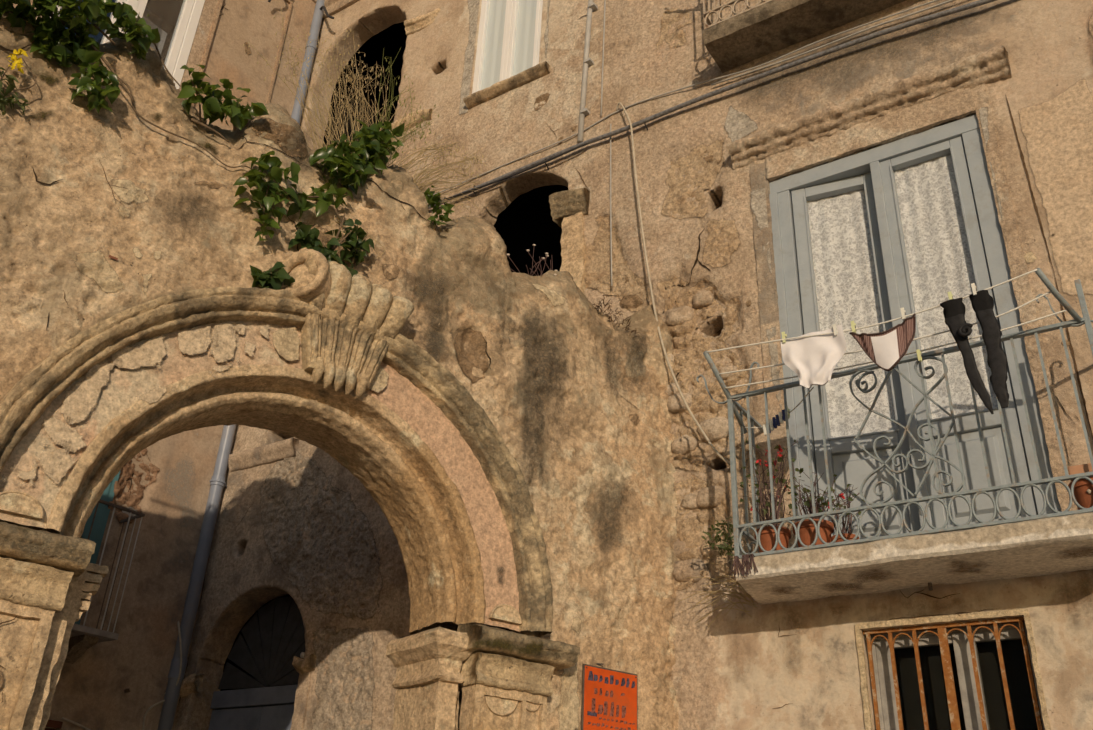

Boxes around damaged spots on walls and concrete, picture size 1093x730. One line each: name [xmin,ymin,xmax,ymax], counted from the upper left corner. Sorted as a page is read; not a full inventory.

leakage [519,312,565,452]
leakage [632,335,647,376]
leakage [598,492,623,547]
crack [886,588,988,621]